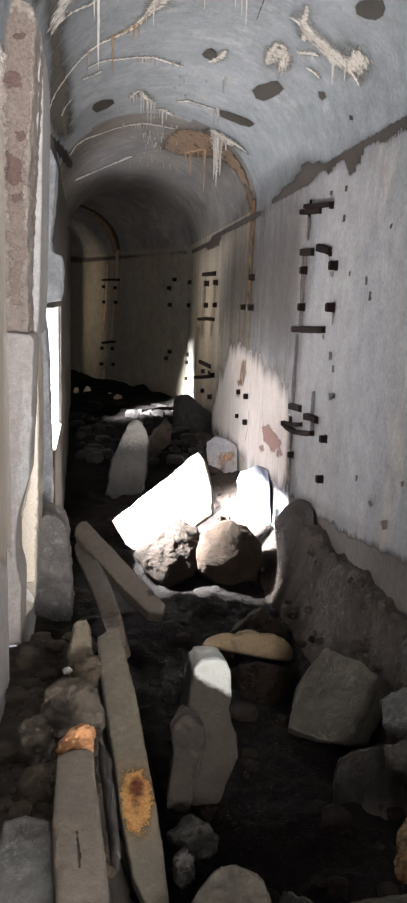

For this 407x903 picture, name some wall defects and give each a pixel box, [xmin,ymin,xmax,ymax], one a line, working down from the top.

leakage [265,4,373,86]
spalling [355,0,385,20]
leakage [33,0,248,191]
spalling [253,81,284,101]
corrosion [162,129,256,304]
peeling [259,424,282,457]